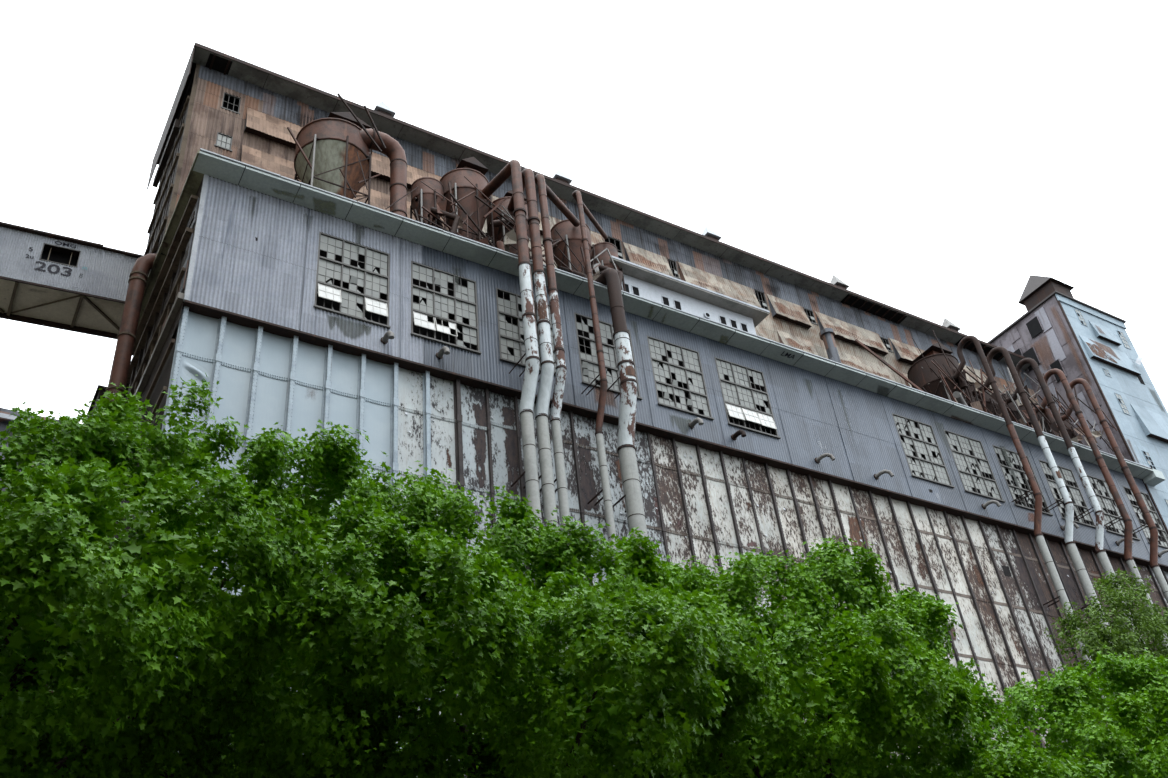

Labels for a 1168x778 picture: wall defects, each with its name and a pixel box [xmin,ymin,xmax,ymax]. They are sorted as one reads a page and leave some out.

corrosion [631,253,668,271]
corrosion [1052,308,1120,384]
peeling [471,402,520,502]
peeling [577,433,599,511]
peeling [610,459,625,514]
peeling [847,516,892,573]
peeling [912,538,931,580]